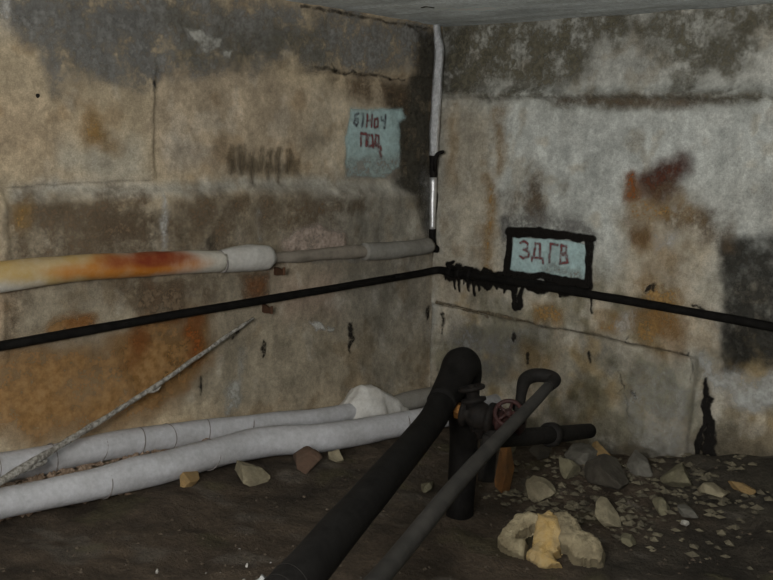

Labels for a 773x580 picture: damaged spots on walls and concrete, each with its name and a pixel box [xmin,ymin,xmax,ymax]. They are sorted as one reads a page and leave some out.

crack [315,67,405,81]
water stain [11,0,773,237]
rust [625,154,706,226]
rust [0,283,206,440]
water stain [700,231,773,411]